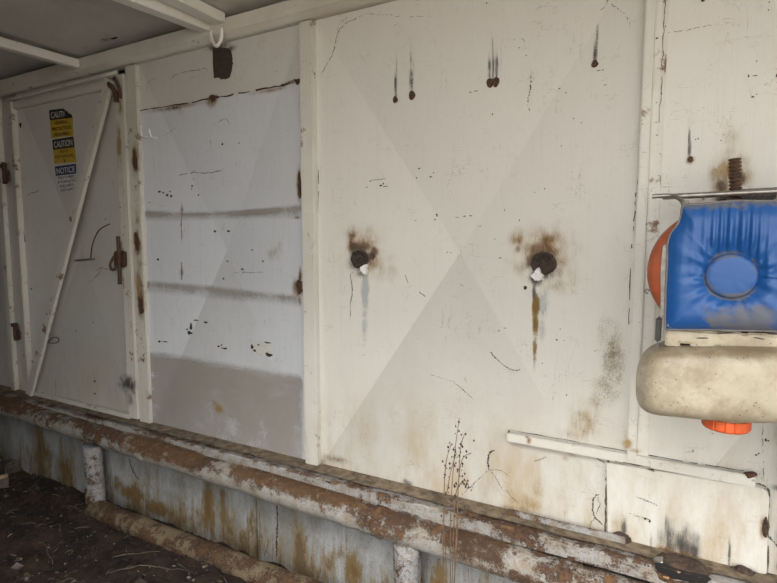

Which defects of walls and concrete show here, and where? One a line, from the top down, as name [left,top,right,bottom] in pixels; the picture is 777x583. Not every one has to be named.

crack [140,68,300,121]
corrosion [349,232,377,329]
corrosion [524,235,557,360]
corrosion [119,433,203,468]
corrosion [226,462,371,511]
corrosion [337,550,362,583]
corrosion [389,509,419,533]
crack [465,450,514,500]
corrosion [443,526,543,583]
corrosion [613,522,632,544]
crack [507,429,777,568]
corrosion [730,565,756,576]